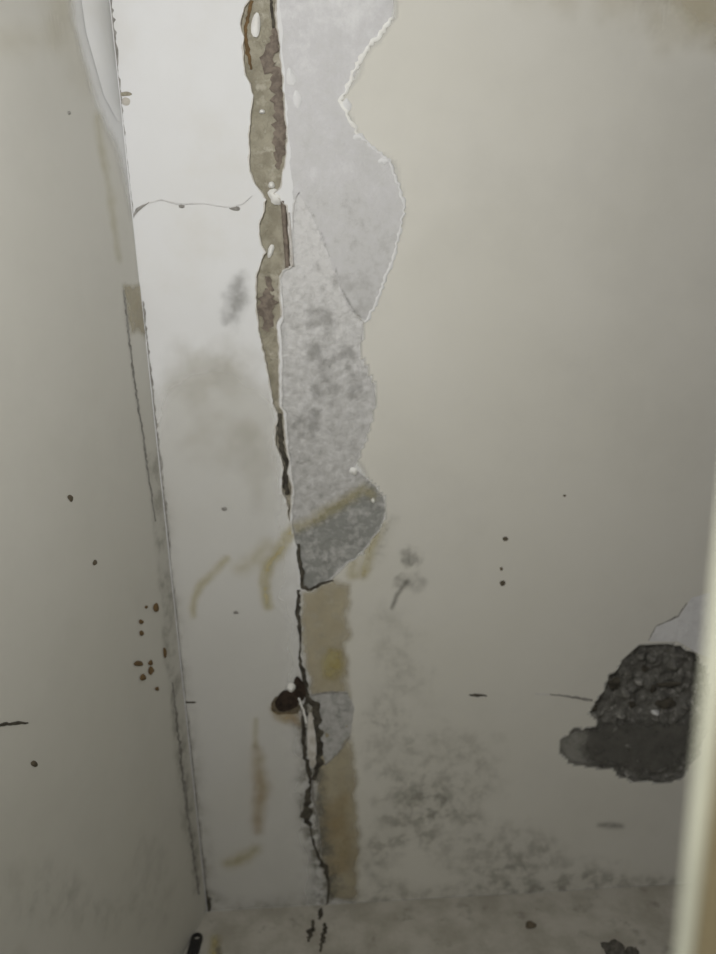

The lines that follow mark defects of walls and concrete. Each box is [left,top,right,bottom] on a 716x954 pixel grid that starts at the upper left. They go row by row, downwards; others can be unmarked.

crack [0,719,28,727]
corrosion [134,660,154,681]
crack [123,287,212,912]
crack [110,0,294,522]
spalling [271,676,354,766]
crack [295,590,331,952]
spalling [279,0,406,591]
damp [302,0,716,903]
spalling [560,593,711,783]